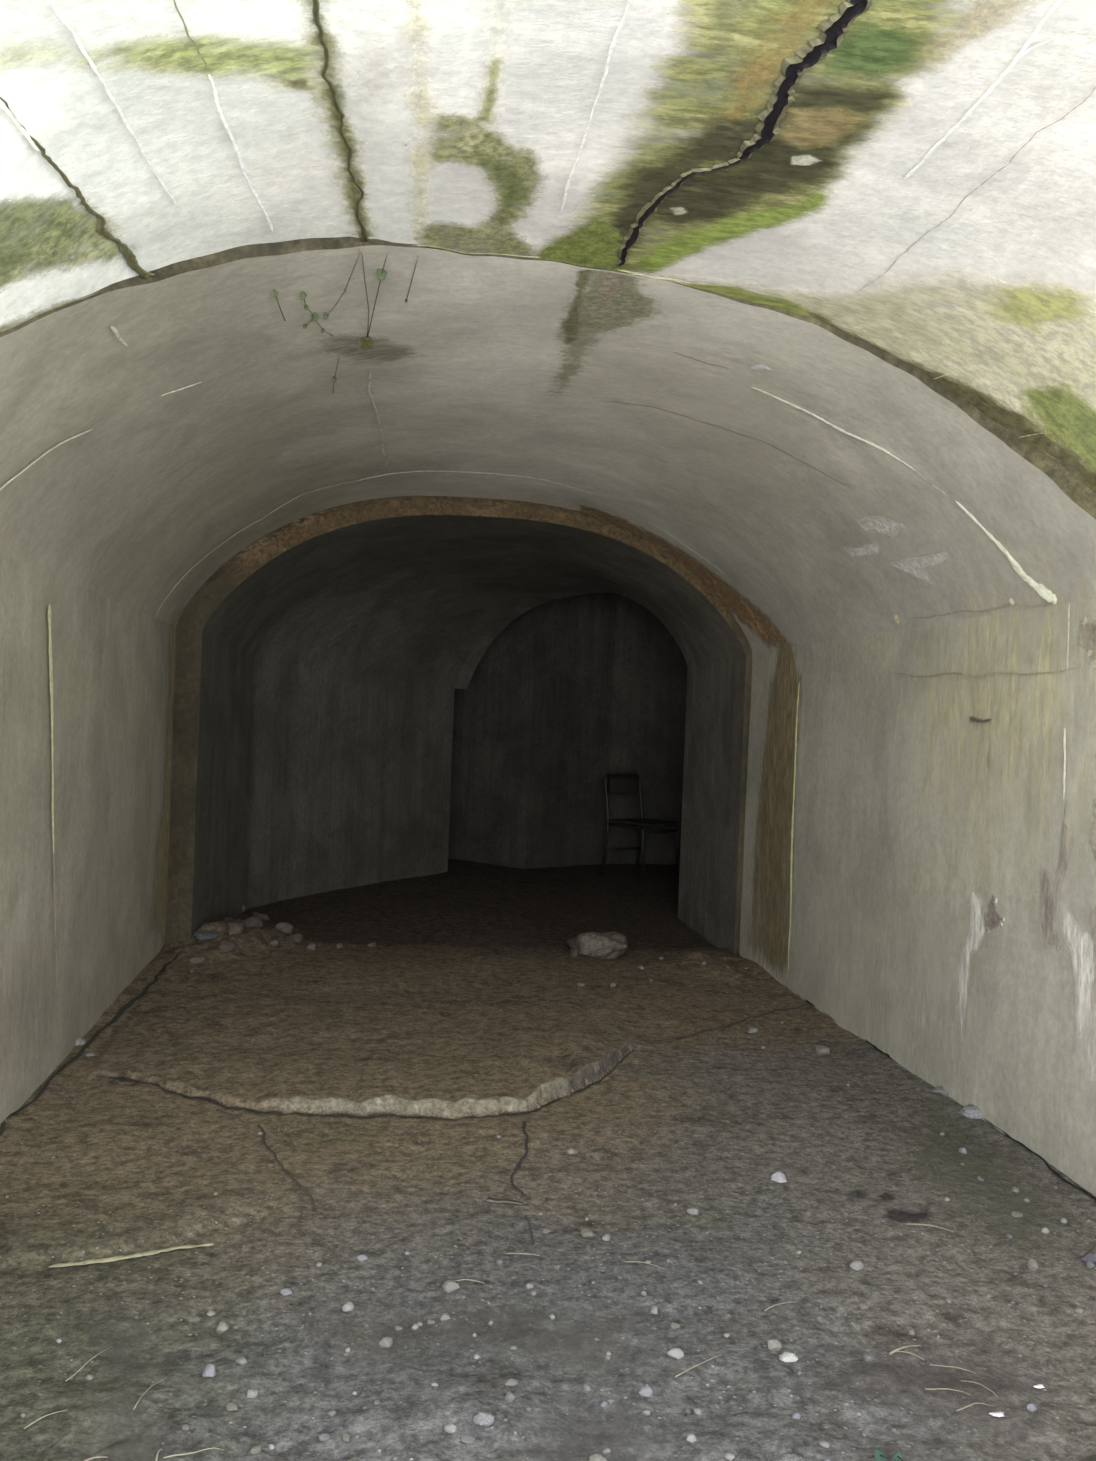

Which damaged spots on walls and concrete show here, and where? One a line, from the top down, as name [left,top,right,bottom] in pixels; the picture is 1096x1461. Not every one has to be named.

crack [0,97,155,279]
crack [312,0,368,242]
crack [617,0,872,266]
water stain [534,0,1027,393]
peeling [1077,617,1096,669]
peeling [1037,825,1071,949]